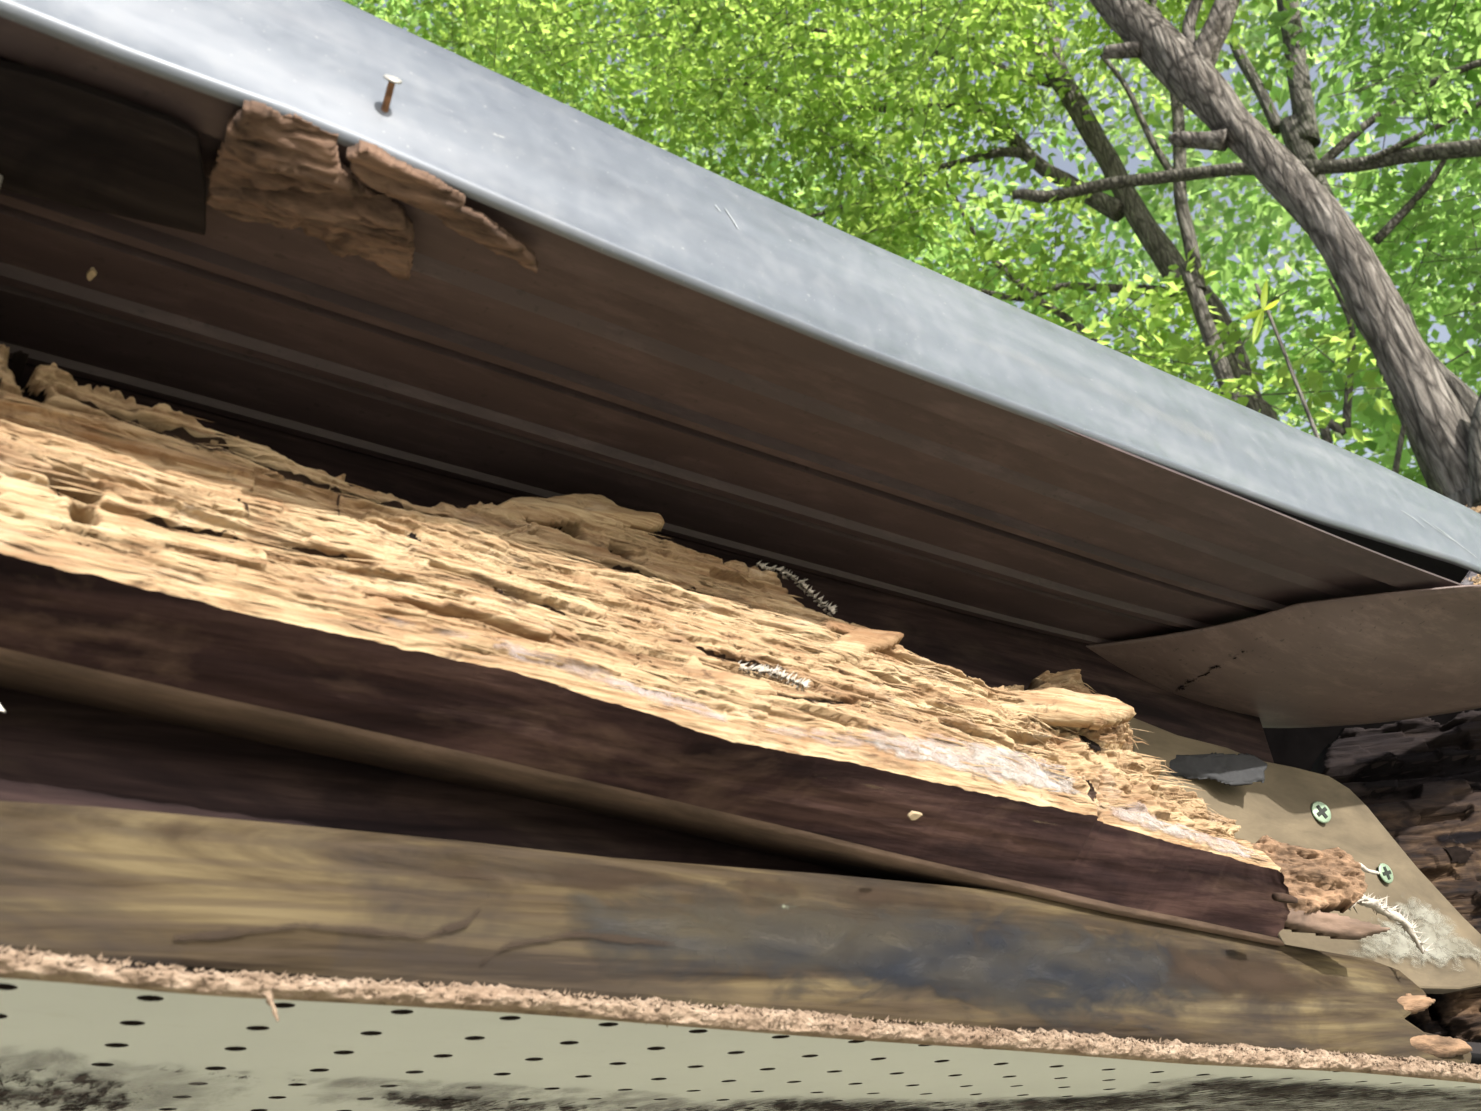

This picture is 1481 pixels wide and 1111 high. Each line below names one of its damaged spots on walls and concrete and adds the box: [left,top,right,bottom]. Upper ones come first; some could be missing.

spalling [9,350,46,403]
peeling [511,647,724,720]
peeling [843,731,1081,793]
spalling [1079,735,1101,752]
peeling [1112,803,1253,857]
water stain [1437,830,1481,844]
water stain [1363,902,1481,962]
peeling [1397,993,1436,1015]
peeling [1410,1035,1472,1057]
water stain [0,1058,162,1111]
water stain [382,1085,646,1111]
water stain [671,1079,1481,1111]